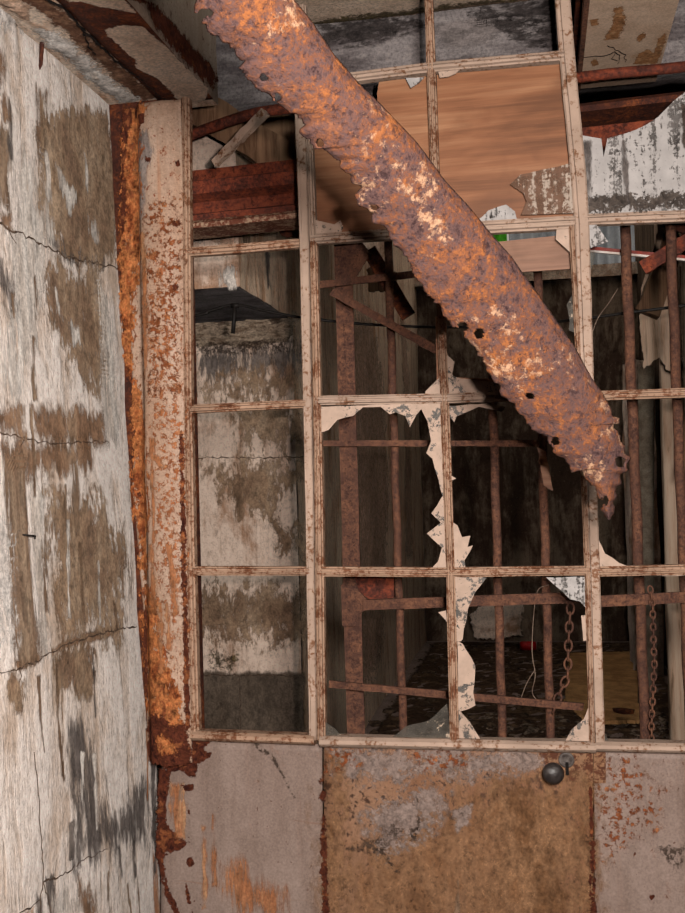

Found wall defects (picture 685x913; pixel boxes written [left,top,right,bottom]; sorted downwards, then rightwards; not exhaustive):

crack [0,221,117,271]
water stain [0,53,157,913]
corrosion [19,0,288,913]
crack [0,626,137,682]
corrosion [318,748,363,802]
corrosion [409,749,468,777]
crack [19,752,105,913]
corrosion [319,814,330,913]
corrosion [588,754,667,913]